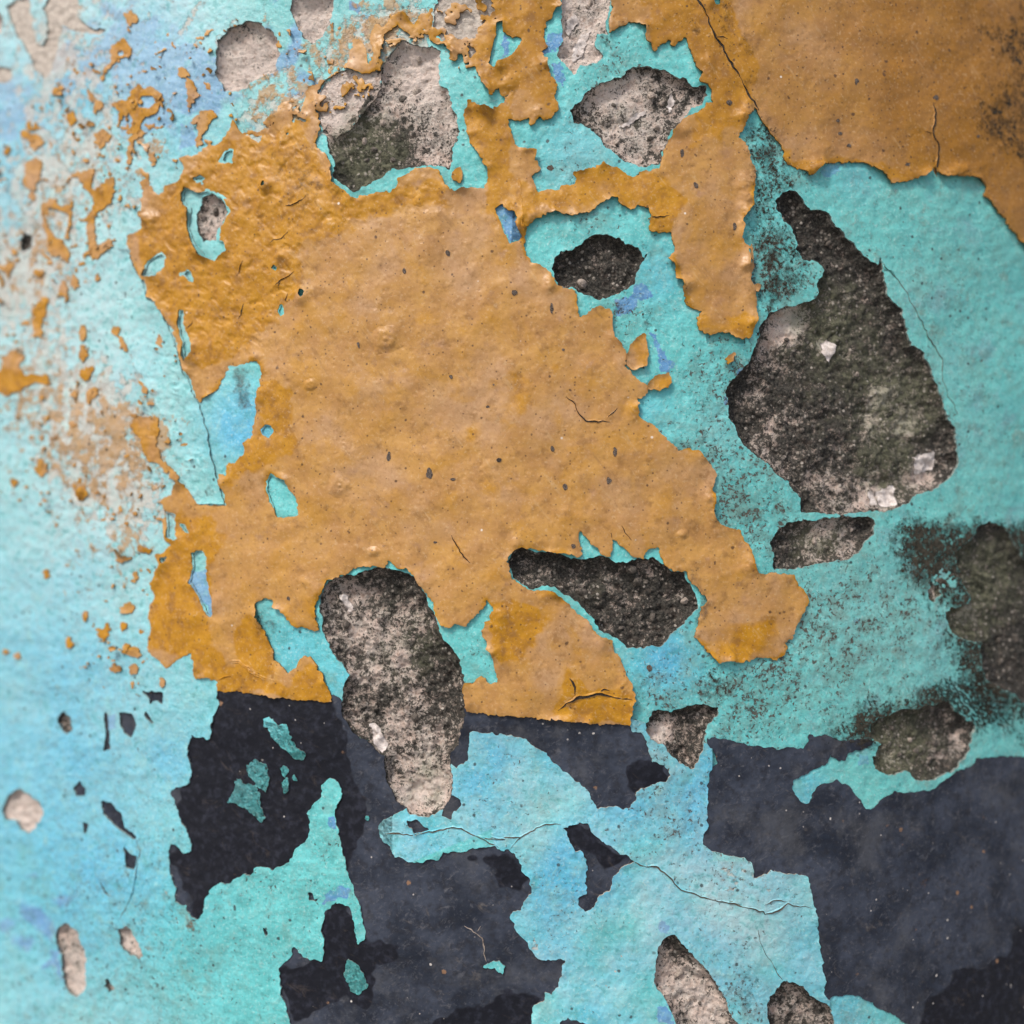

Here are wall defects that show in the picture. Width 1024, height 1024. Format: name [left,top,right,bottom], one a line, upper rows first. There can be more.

peeling [508,0,713,192]
crack [696,0,759,111]
peeling [0,0,522,1024]
peeling [255,108,1024,1024]
crack [386,823,561,848]